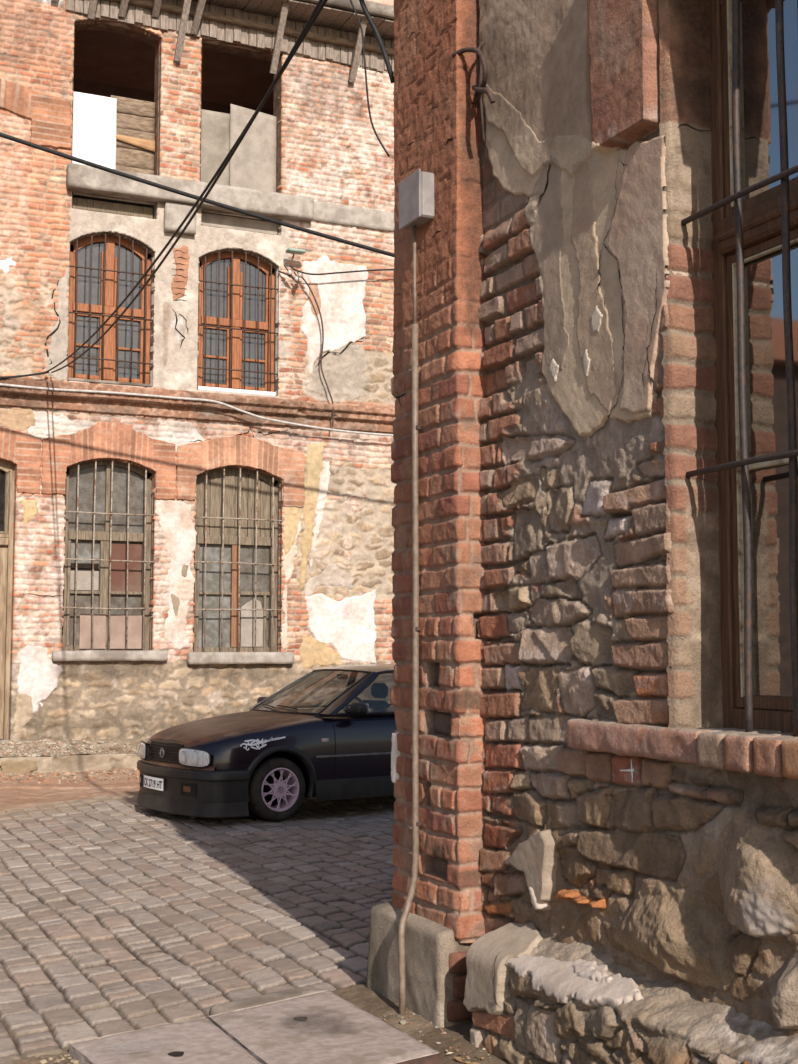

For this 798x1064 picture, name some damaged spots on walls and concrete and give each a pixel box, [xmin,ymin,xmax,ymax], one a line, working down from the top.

peeling [301,254,370,403]
peeling [479,0,691,437]
crack [589,160,659,439]
peeling [155,499,197,651]
peeling [278,443,377,669]
peeling [13,645,63,733]
spalling [447,829,644,1047]